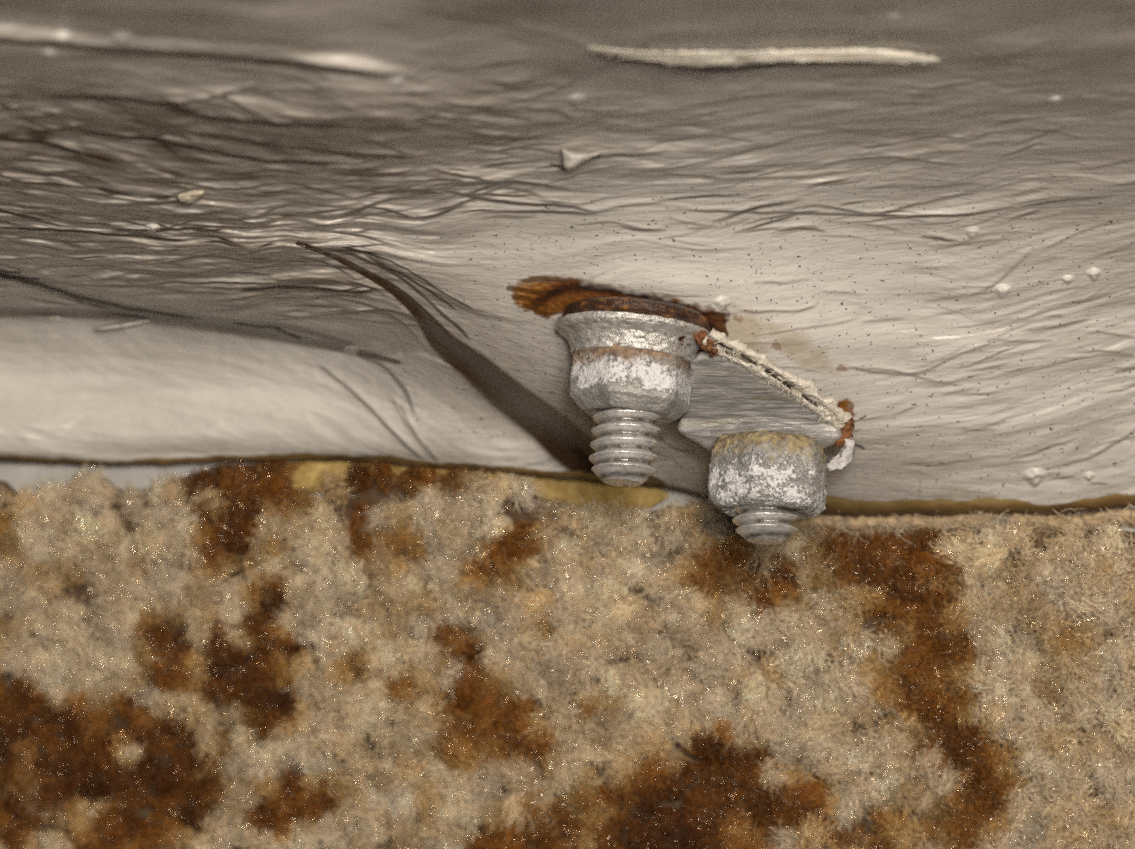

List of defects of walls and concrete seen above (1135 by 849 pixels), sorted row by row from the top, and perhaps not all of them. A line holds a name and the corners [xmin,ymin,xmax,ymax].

peeling [588,46,941,72]
corrosion [507,277,728,336]
peeling [699,328,853,432]
corrosion [837,399,854,416]
corrosion [827,437,855,472]